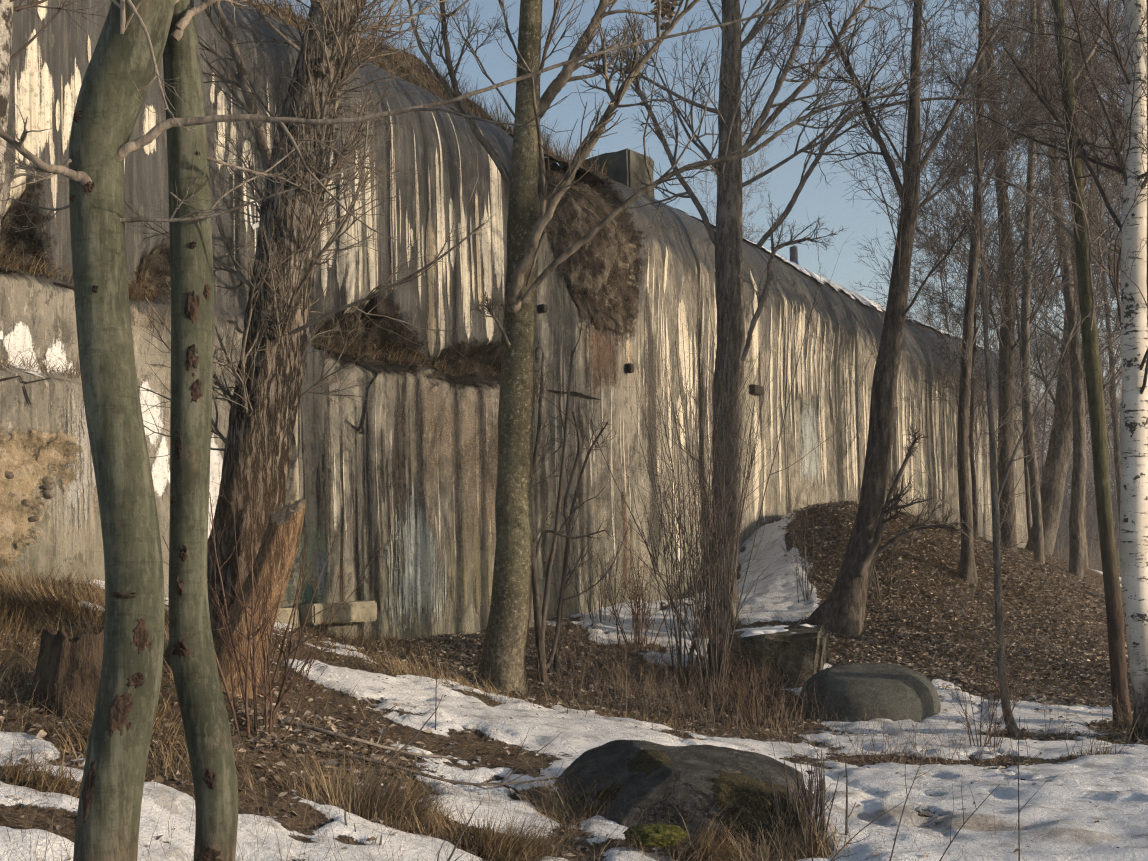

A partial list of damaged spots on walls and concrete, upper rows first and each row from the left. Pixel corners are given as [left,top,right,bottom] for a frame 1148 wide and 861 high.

water stain [1,0,91,221]
water stain [143,105,158,156]
water stain [210,73,256,268]
water stain [266,82,277,151]
water stain [320,102,504,357]
spalling [538,154,649,342]
peeling [0,321,76,377]
spalling [0,389,98,567]
water stain [285,376,493,630]
water stain [540,242,717,585]
water stain [750,271,876,523]
water stain [897,379,998,513]